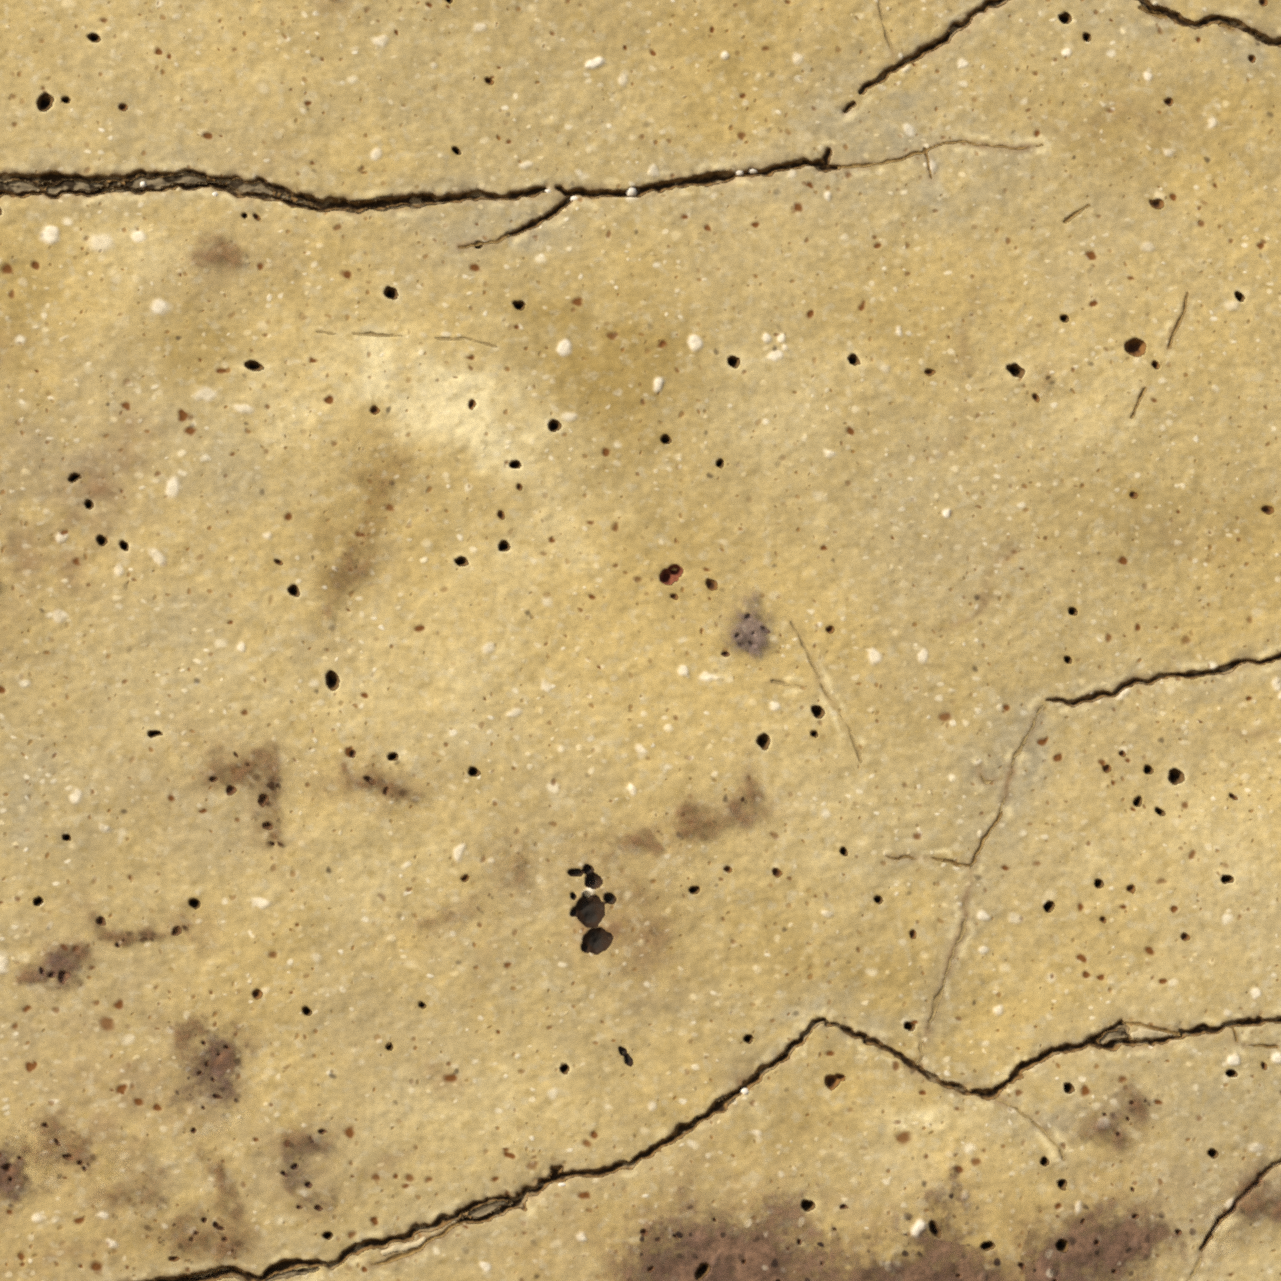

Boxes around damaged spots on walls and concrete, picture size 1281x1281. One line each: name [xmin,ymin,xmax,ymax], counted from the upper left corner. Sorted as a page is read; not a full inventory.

crack [844,0,1008,113]
crack [1138,0,1281,47]
crack [0,140,1043,248]
crack [886,653,1281,867]
crack [147,899,1281,1281]
leakage [623,1196,1006,1281]
leakage [1018,1201,1194,1281]